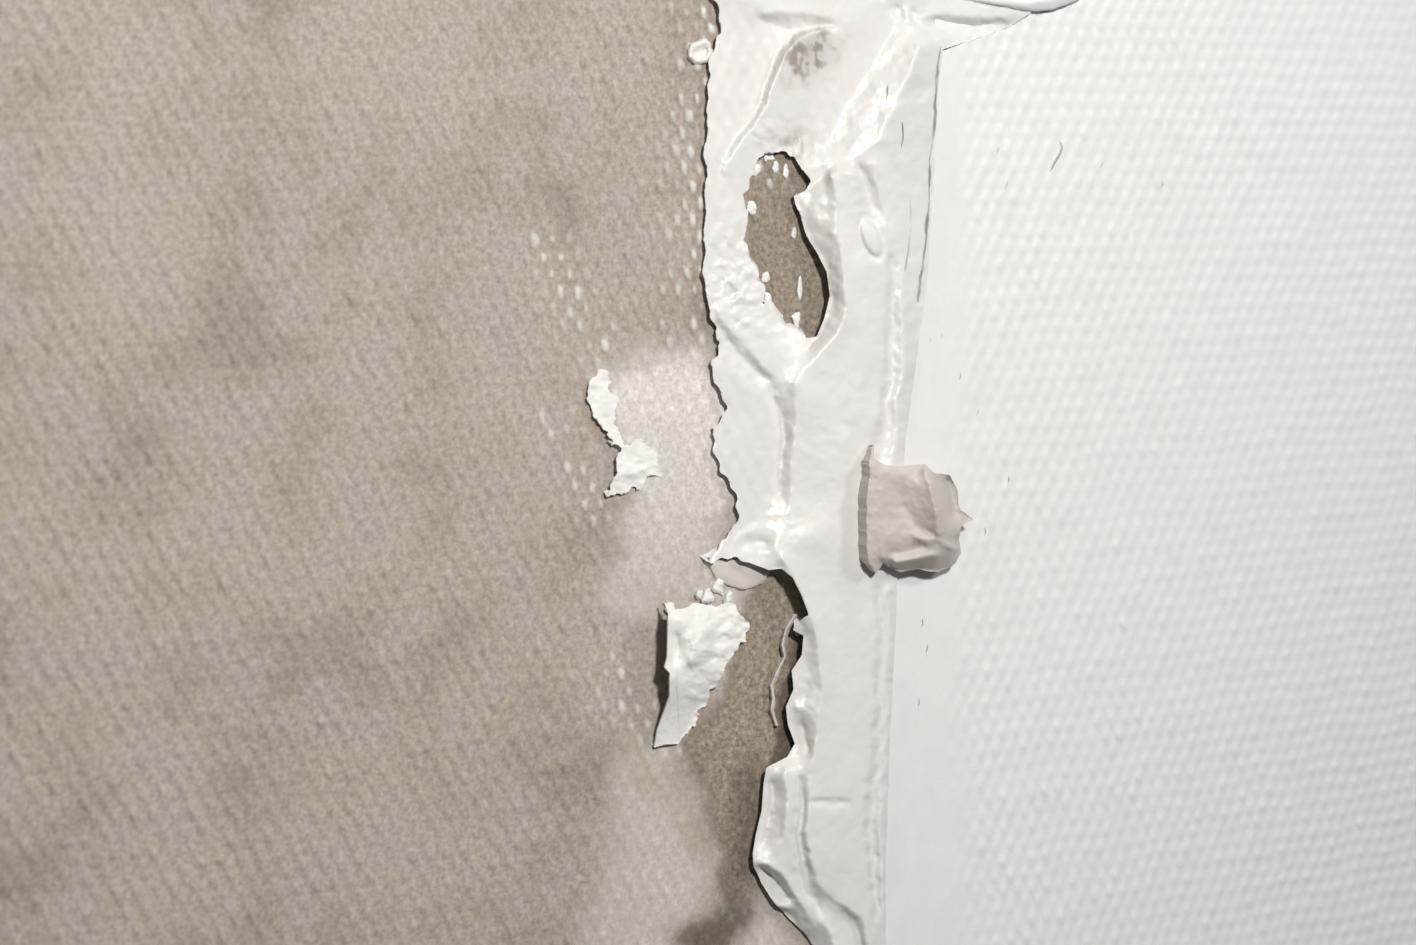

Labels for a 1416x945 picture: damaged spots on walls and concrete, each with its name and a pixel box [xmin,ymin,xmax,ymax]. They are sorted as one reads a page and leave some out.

peeling [686,38,714,64]
peeling [745,153,830,336]
peeling [587,369,662,497]
peeling [653,575,808,903]